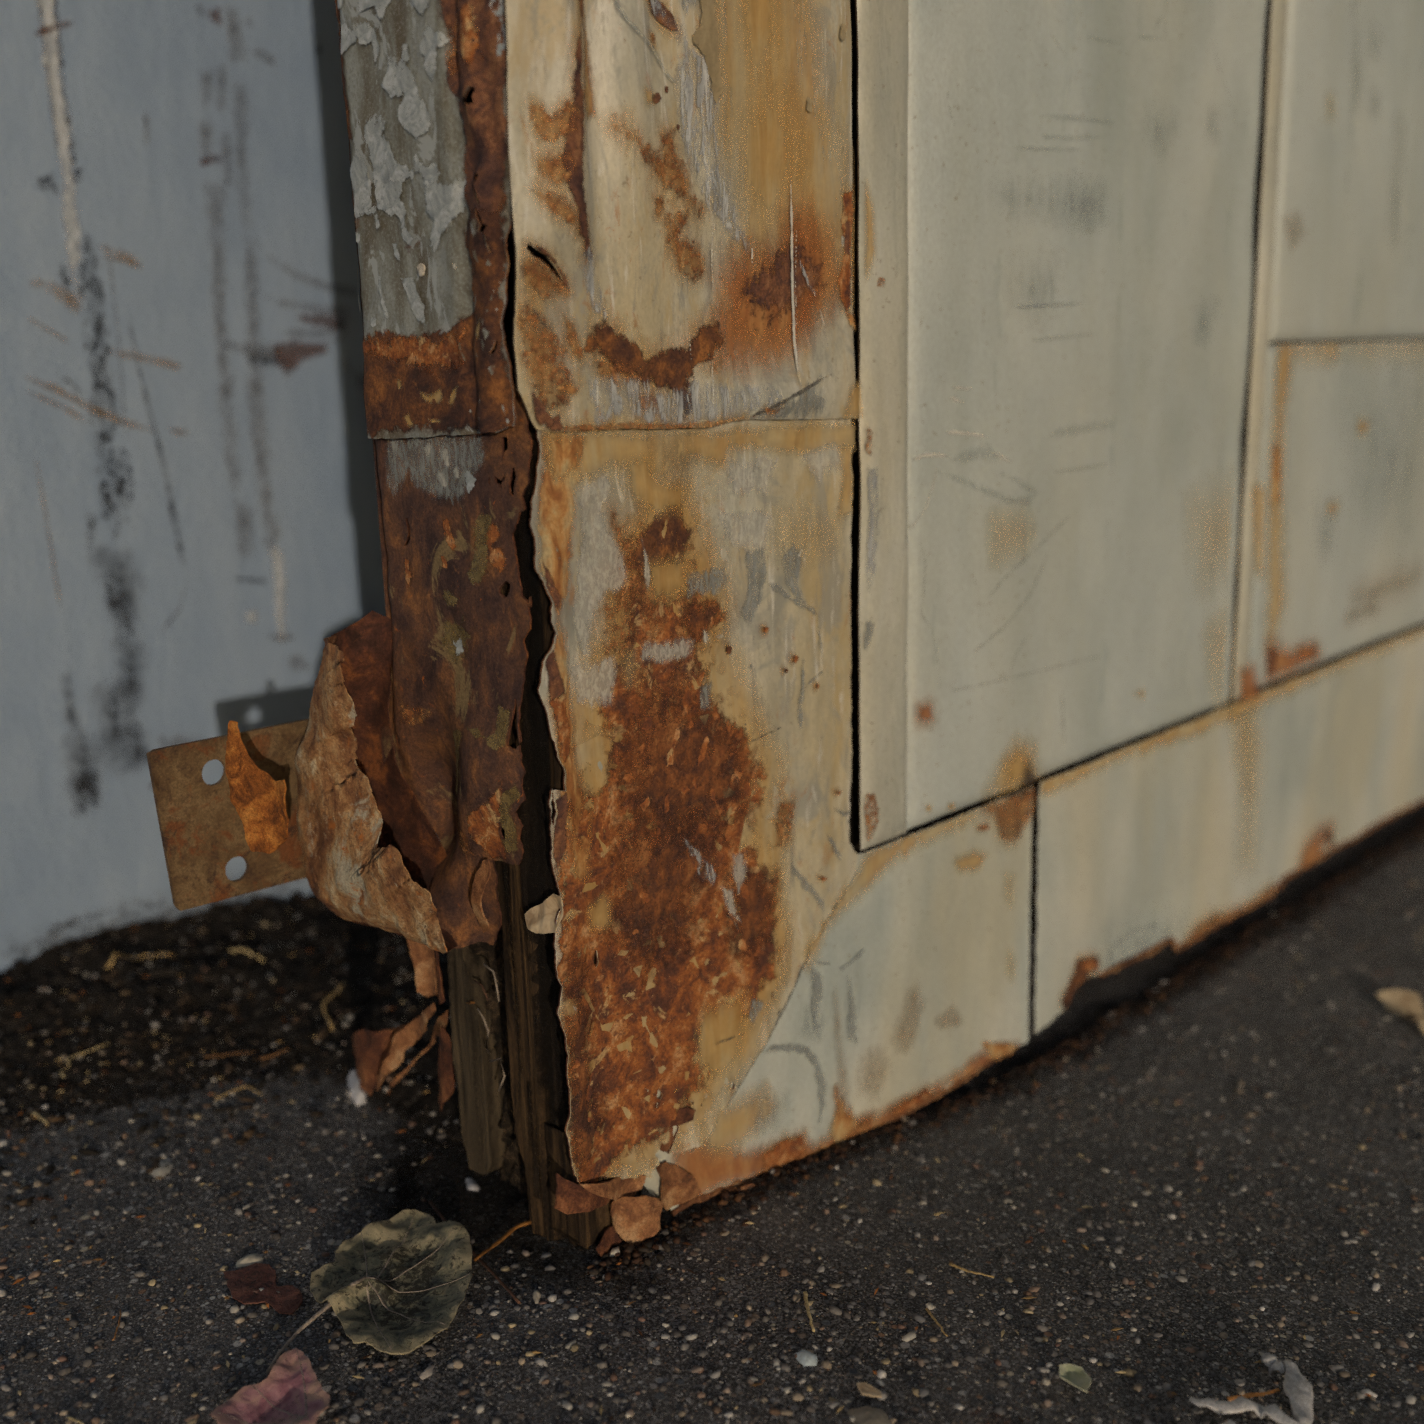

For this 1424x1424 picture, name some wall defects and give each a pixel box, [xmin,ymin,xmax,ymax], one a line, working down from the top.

peeling [337,0,467,327]
peeling [440,589,471,664]
corrosion [334,0,1017,1216]
corrosion [225,720,289,854]
peeling [453,705,510,792]